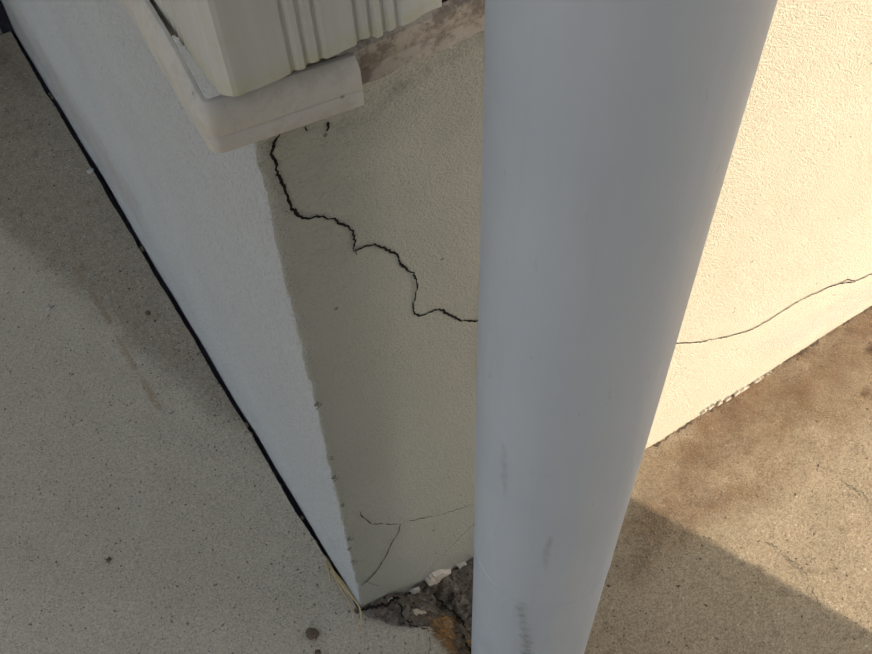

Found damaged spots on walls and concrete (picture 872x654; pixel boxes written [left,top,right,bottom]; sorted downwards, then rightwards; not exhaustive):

crack [270,134,478,322]
crack [644,306,872,452]
crack [676,274,872,344]
spalling [354,559,474,654]
crack [360,505,474,654]